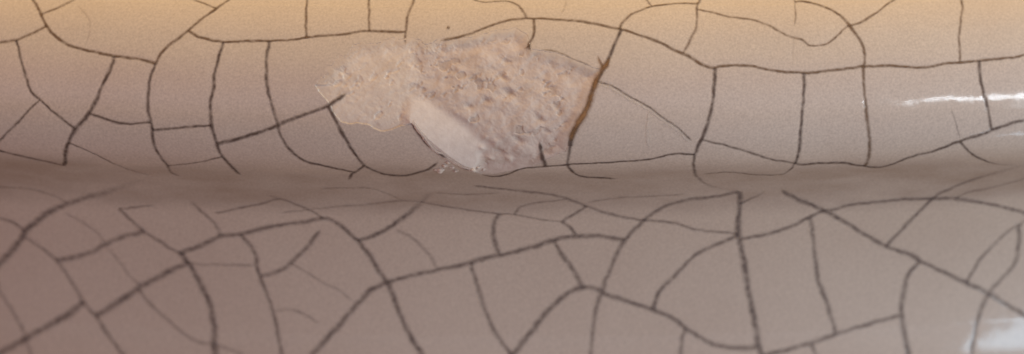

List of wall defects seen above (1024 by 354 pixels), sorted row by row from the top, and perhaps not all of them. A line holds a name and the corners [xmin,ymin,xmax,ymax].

crack [0,0,436,177]
spalling [316,28,600,174]
crack [5,206,62,257]
crack [0,224,282,353]
crack [313,0,1024,354]